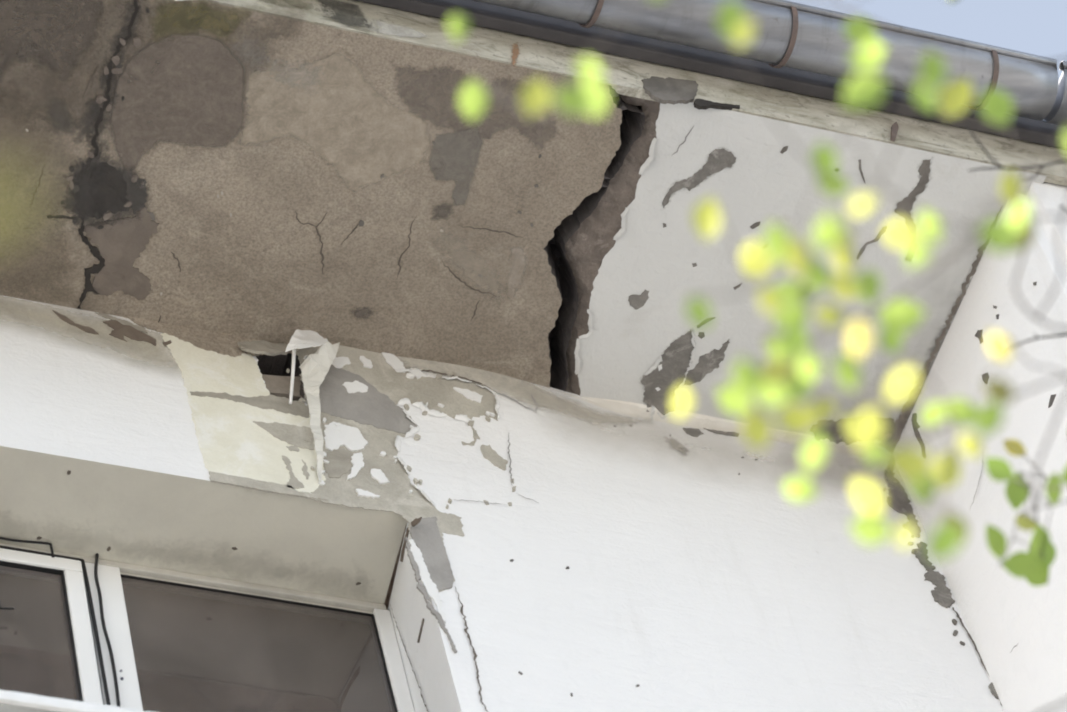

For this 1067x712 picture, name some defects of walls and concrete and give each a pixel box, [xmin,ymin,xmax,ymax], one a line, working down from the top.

crack [23,0,150,309]
water stain [0,0,556,219]
peeling [53,310,516,624]
crack [296,213,359,274]
crack [421,85,740,413]
peeling [628,290,649,310]
peeling [640,326,730,422]
peeling [662,149,736,208]
peeling [856,226,887,260]
peeling [894,159,931,227]
crack [878,244,1002,706]
crack [392,517,488,712]